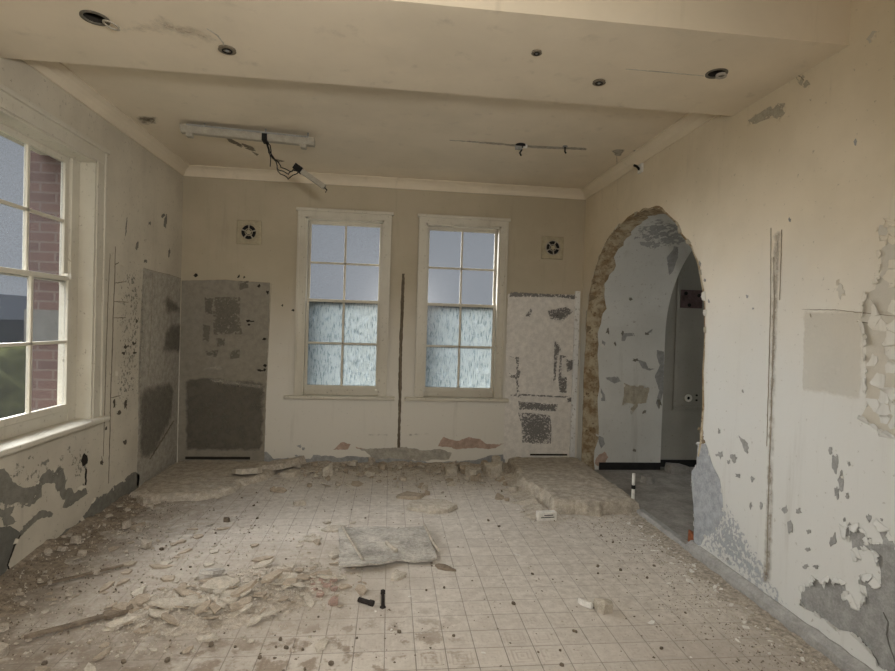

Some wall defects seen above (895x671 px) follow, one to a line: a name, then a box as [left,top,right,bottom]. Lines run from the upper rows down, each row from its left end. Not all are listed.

peeling [748,103,786,127]
flaking render [0,265,575,576]
spalling [581,206,783,604]
spalling [781,505,802,533]
peeling [798,514,895,671]
peeling [857,218,895,439]